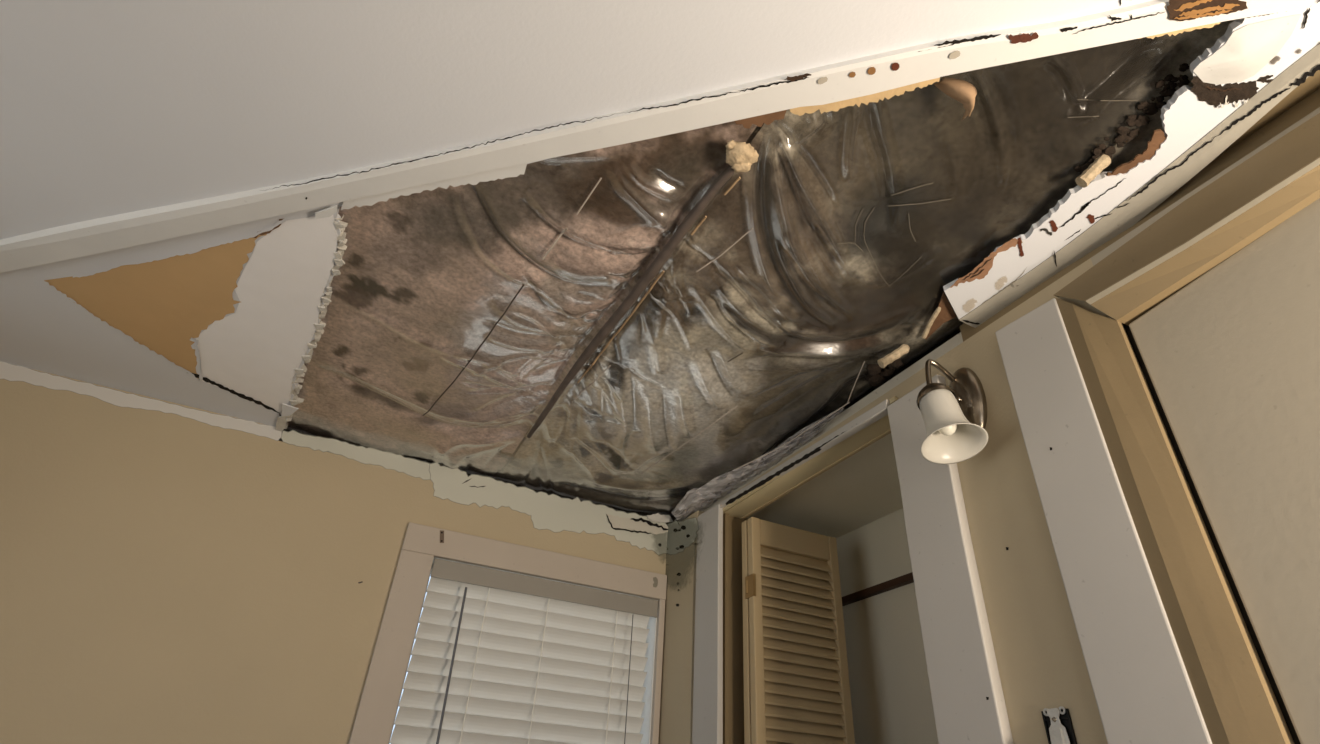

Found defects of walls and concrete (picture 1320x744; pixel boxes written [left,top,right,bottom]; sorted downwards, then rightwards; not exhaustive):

crack [1074,0,1164,34]
crack [1235,0,1320,29]
peeling [1008,32,1039,44]
peeling [934,77,977,120]
crack [1061,64,1320,240]
peeling [196,215,345,431]
flaking render [606,513,673,535]